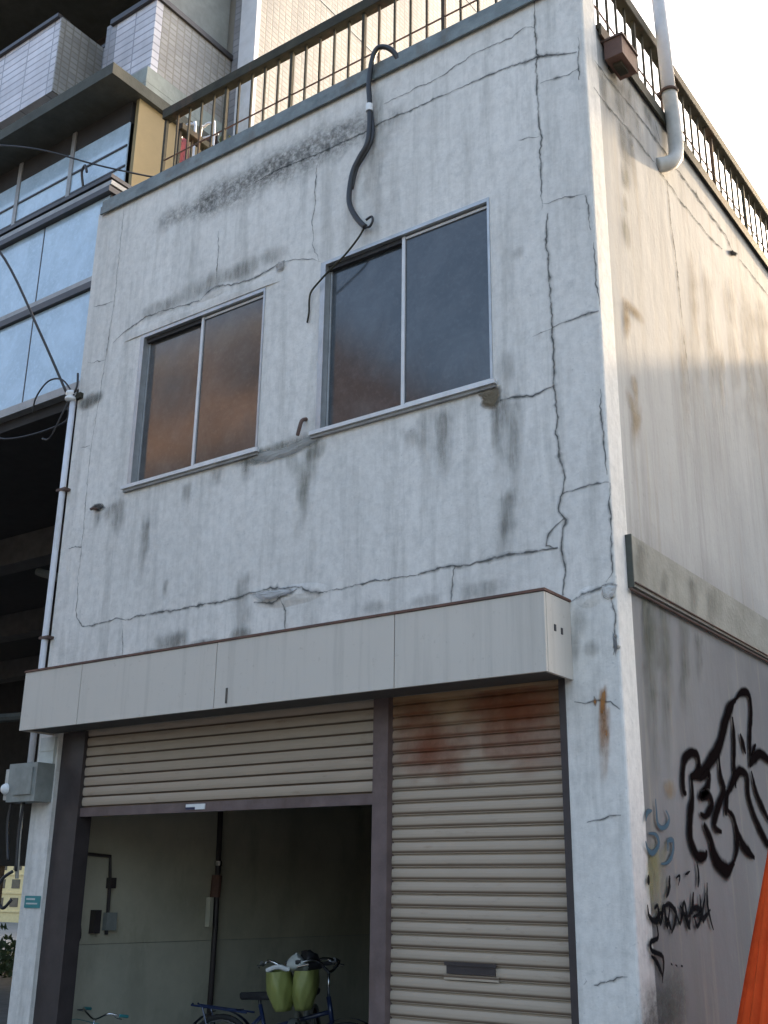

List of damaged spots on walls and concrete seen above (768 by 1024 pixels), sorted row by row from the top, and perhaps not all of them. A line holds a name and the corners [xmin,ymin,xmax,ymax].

crack [69,1,767,655]
rust [594,689,608,739]